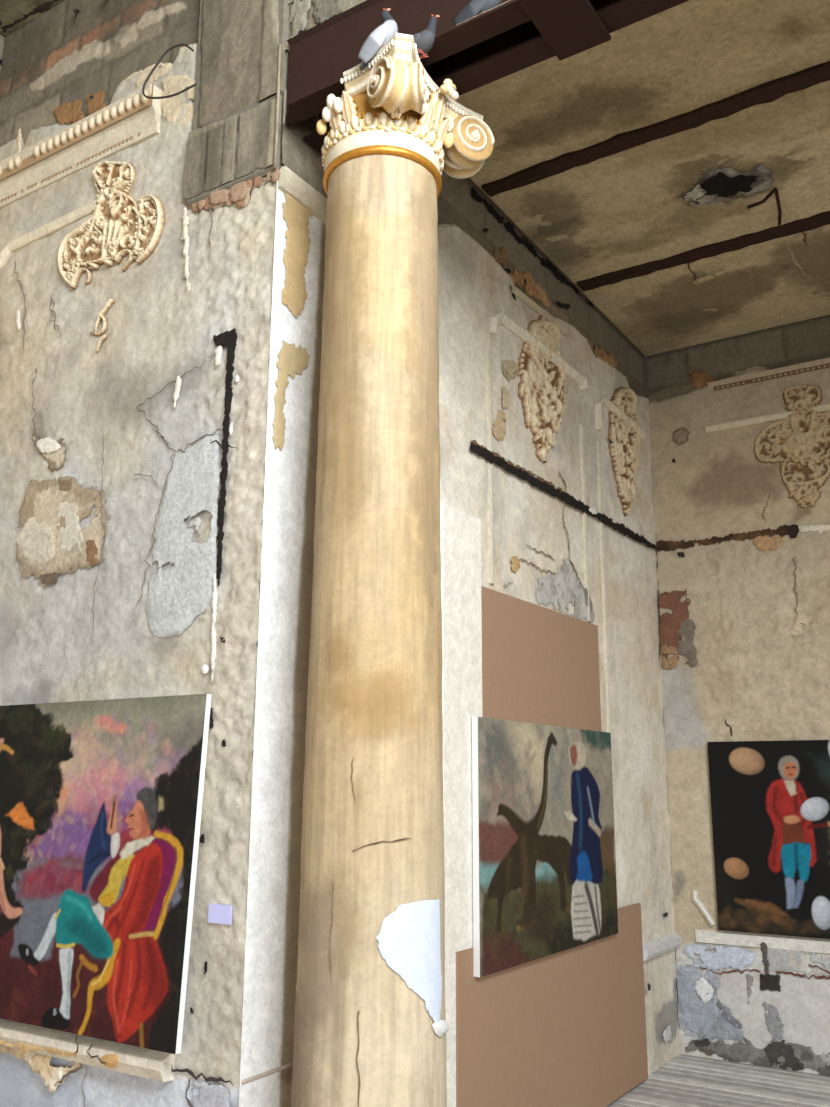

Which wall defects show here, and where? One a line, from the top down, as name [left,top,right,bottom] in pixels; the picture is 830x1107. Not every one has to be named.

peeling [282,193,313,318]
spalling [677,164,782,225]
peeling [272,340,310,451]
flaking render [16,429,111,587]
crack [90,435,105,652]
crack [132,355,222,615]
flaking render [657,589,698,670]
flaking render [0,1040,82,1092]
crack [171,1068,234,1107]
peeling [376,899,449,1037]
flaking render [663,942,830,1077]
crack [676,964,830,1030]